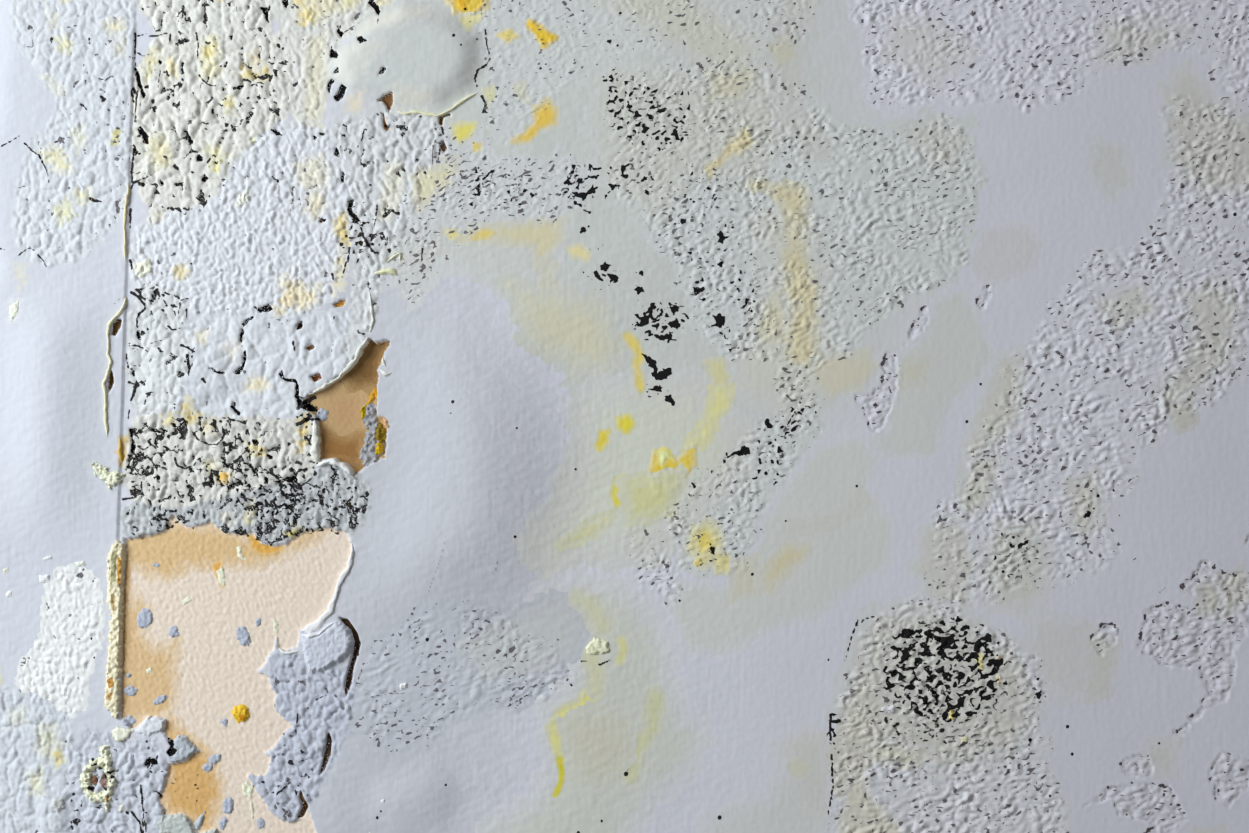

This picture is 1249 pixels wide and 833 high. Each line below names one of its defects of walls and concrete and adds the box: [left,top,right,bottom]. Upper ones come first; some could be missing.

peeling [309,291,375,395]
damp [0,0,338,833]
peeling [310,420,356,480]
damp [208,0,1123,833]
peeling [79,540,197,812]
peeling [300,544,355,675]
peeling [1090,622,1119,652]
peeling [1138,561,1249,736]
peeling [157,811,218,833]
peeling [1208,753,1249,807]